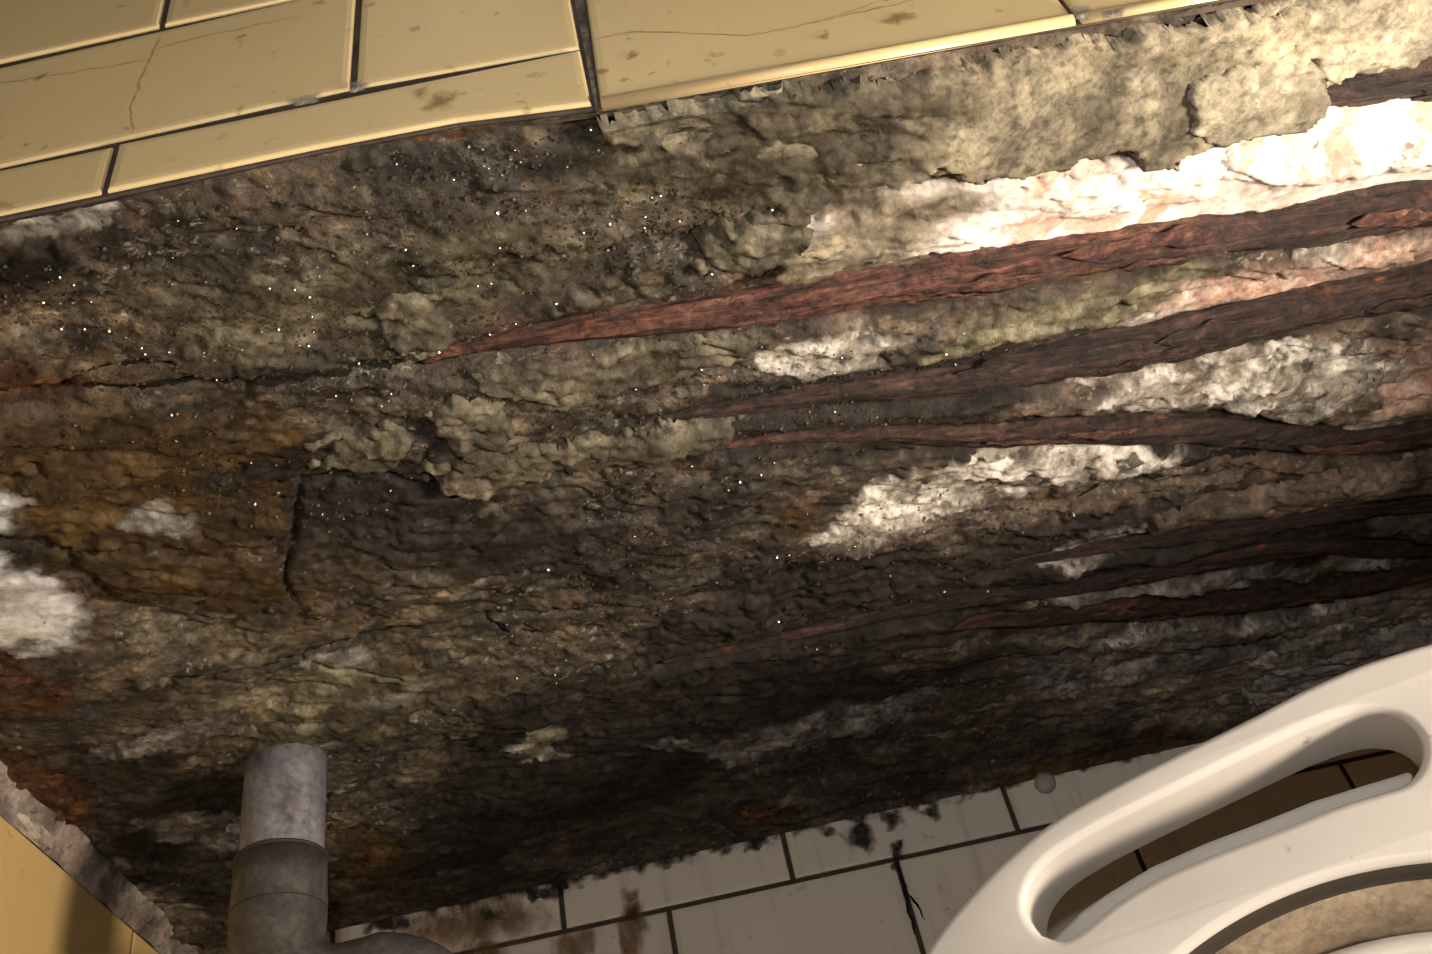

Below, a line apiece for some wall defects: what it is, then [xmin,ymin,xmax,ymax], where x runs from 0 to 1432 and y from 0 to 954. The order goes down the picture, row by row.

crack [129,37,199,118]
peeling [139,0,1432,664]
rust [0,363,88,403]
water stain [201,433,655,594]
water stain [0,494,85,657]
water stain [394,325,1432,880]
water stain [283,650,440,748]
peeling [1242,617,1432,712]
peeling [0,761,199,954]
water stain [426,837,766,921]
rust [619,891,645,954]
crack [893,852,925,935]